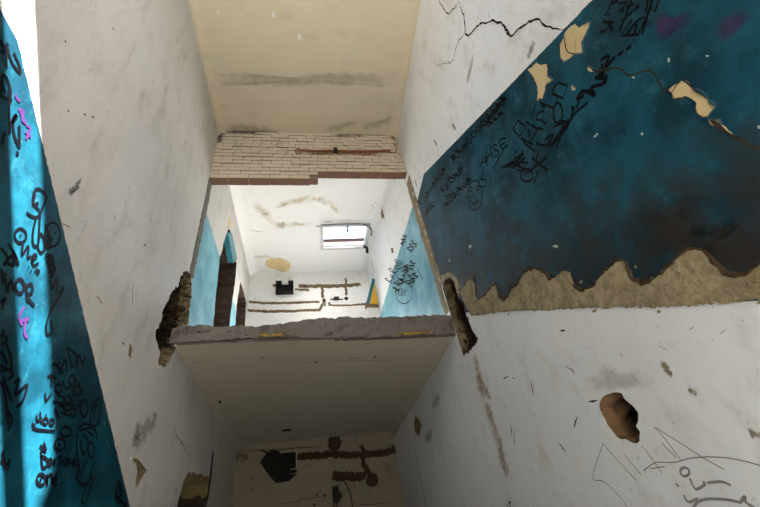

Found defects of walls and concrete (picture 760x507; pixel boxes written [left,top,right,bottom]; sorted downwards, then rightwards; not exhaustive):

crack [439,1,693,94]
peeling [558,20,592,63]
peeling [528,63,554,101]
peeling [667,81,732,134]
crack [709,117,760,150]
flaking render [155,175,760,368]
spalling [599,392,640,444]
flaking render [327,436,342,451]
peeling [129,456,148,486]